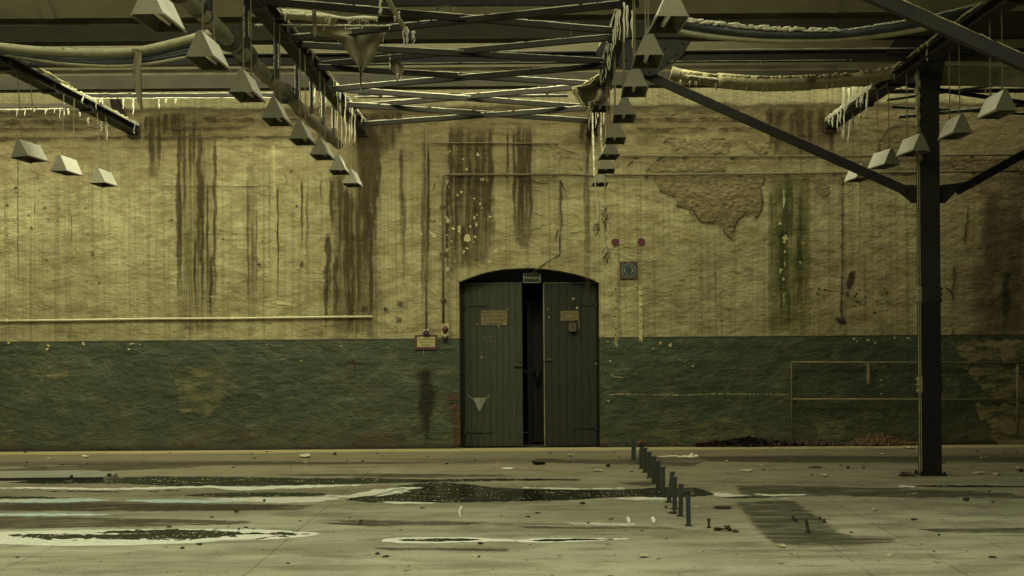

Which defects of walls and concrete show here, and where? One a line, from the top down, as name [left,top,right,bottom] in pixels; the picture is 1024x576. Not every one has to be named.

spalling [646,138,767,241]
leakage [771,186,806,315]